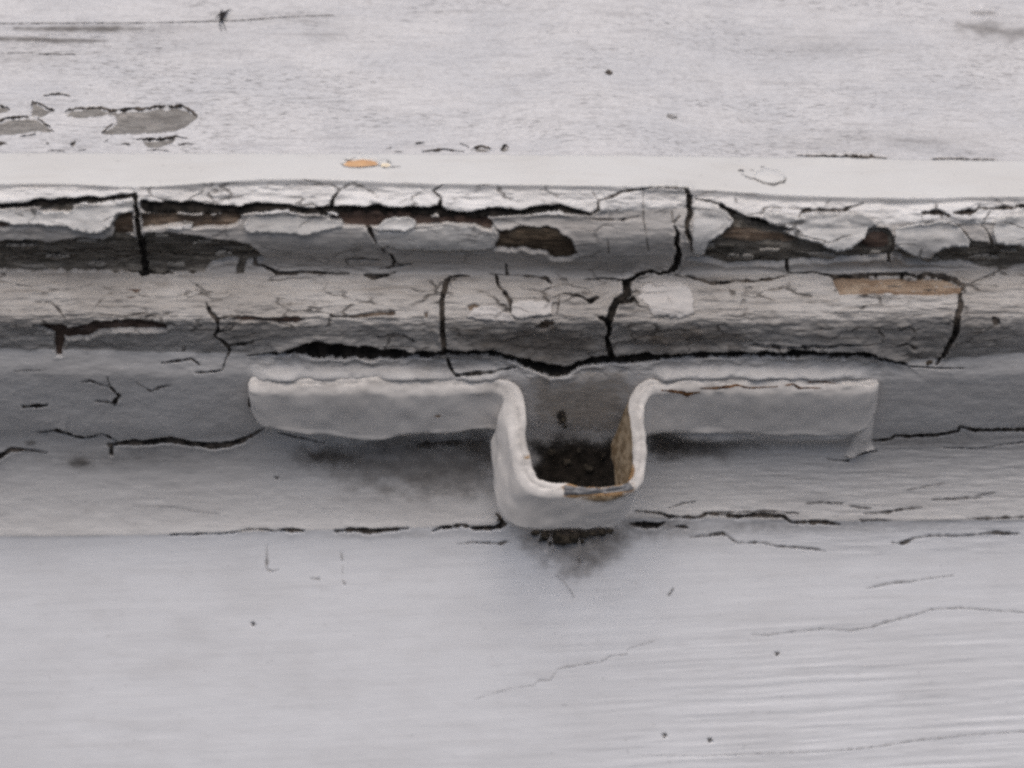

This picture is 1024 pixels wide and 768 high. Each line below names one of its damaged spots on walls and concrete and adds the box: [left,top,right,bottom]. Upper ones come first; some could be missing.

peeling [0,100,197,151]
peeling [0,200,577,275]
peeling [693,200,1024,269]
crack [923,204,1024,244]
crack [0,186,965,406]
peeling [833,277,962,299]
crack [0,404,324,459]
crack [133,506,303,536]
crack [335,516,508,545]
crack [631,484,1023,552]